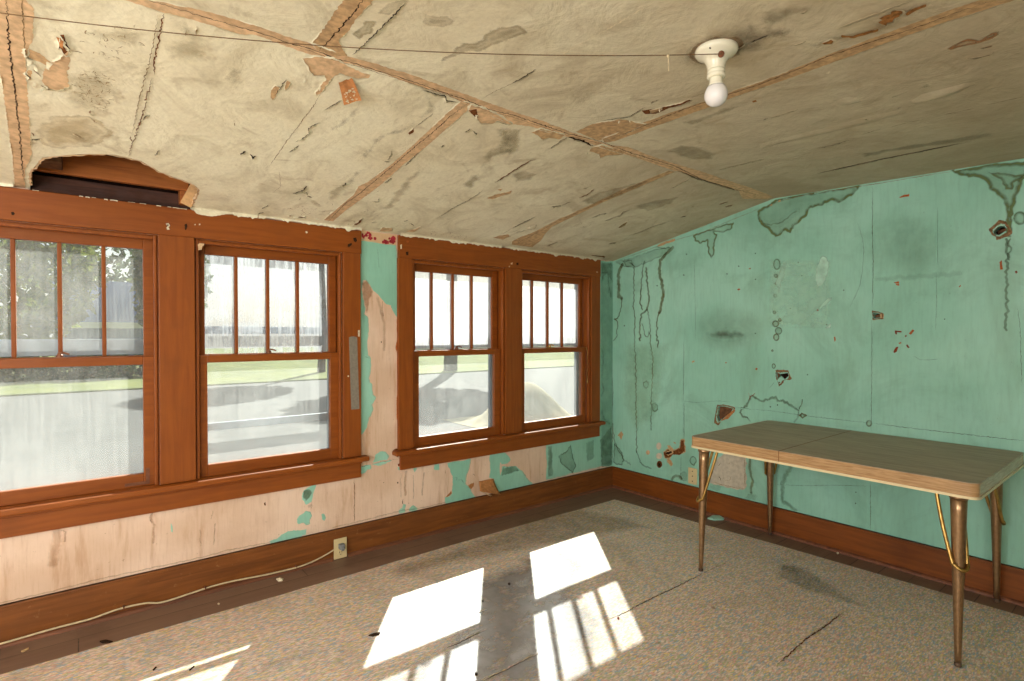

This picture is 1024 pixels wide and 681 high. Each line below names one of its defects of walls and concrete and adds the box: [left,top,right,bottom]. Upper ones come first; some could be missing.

peeling [21,23,74,92]
crack [72,14,200,157]
spalling [0,117,178,194]
peeling [532,96,710,159]
water stain [758,185,860,237]
water stain [952,162,1024,245]
hole [989,220,1012,240]
water stain [610,249,671,464]
hole [775,370,792,386]
spalling [714,404,735,425]
spalling [658,439,686,466]